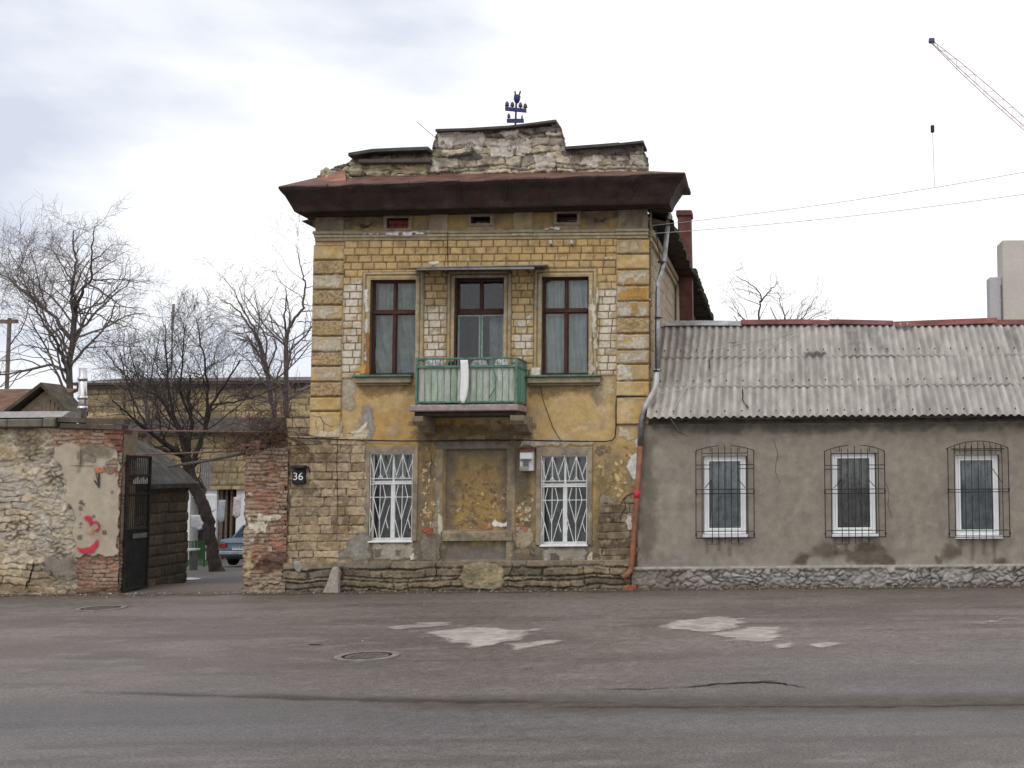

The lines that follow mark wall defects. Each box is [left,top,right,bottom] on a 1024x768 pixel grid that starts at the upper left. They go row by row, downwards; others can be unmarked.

spalling [243,275,381,579]
flaking render [54,442,121,558]
spalling [395,462,535,561]
spalling [521,426,639,566]
leakage [795,543,895,565]